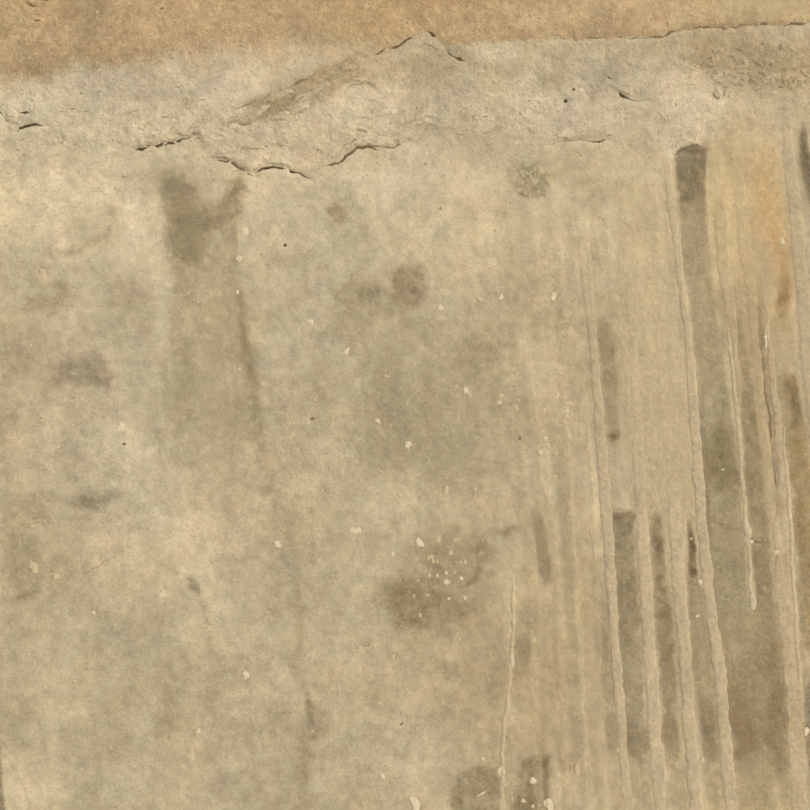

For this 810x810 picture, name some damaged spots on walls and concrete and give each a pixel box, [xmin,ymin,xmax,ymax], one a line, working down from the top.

spalling [227,54,366,128]
spalling [689,41,810,99]
leakage [799,128,810,201]
leakage [163,176,262,445]
leakage [372,520,501,638]
leakage [534,521,552,582]
leakage [676,147,789,808]
leakage [783,374,810,647]
leakage [602,509,650,794]
leakage [650,515,679,768]
leakage [450,766,500,810]
leakage [511,757,552,810]